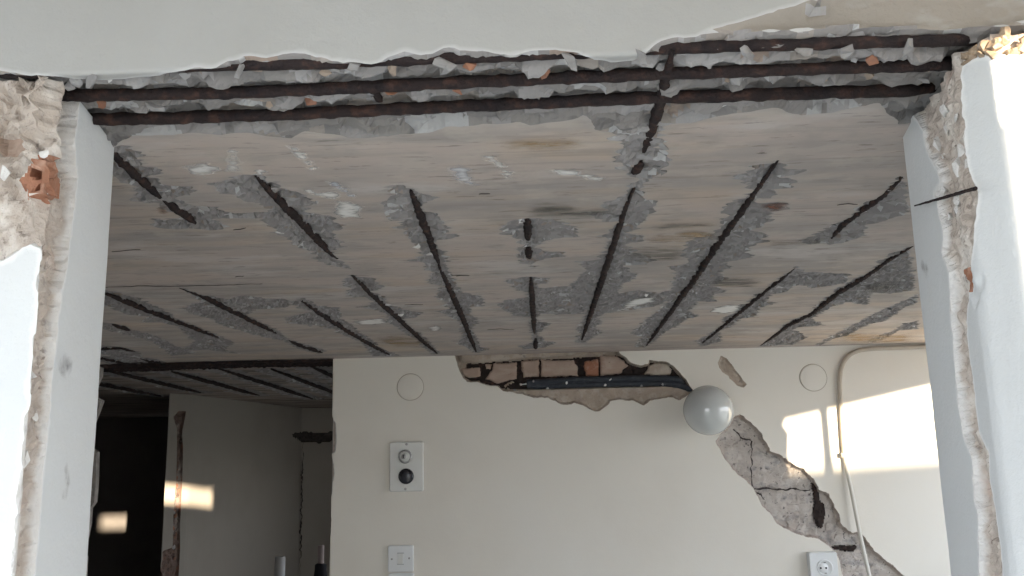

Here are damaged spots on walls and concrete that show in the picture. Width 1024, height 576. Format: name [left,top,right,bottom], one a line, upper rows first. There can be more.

flaking render [0,71,79,576]
flaking render [160,411,186,576]
spalling [99,284,402,400]
spalling [46,24,1001,354]
flaking render [380,185,693,412]
flaking render [713,0,1024,576]